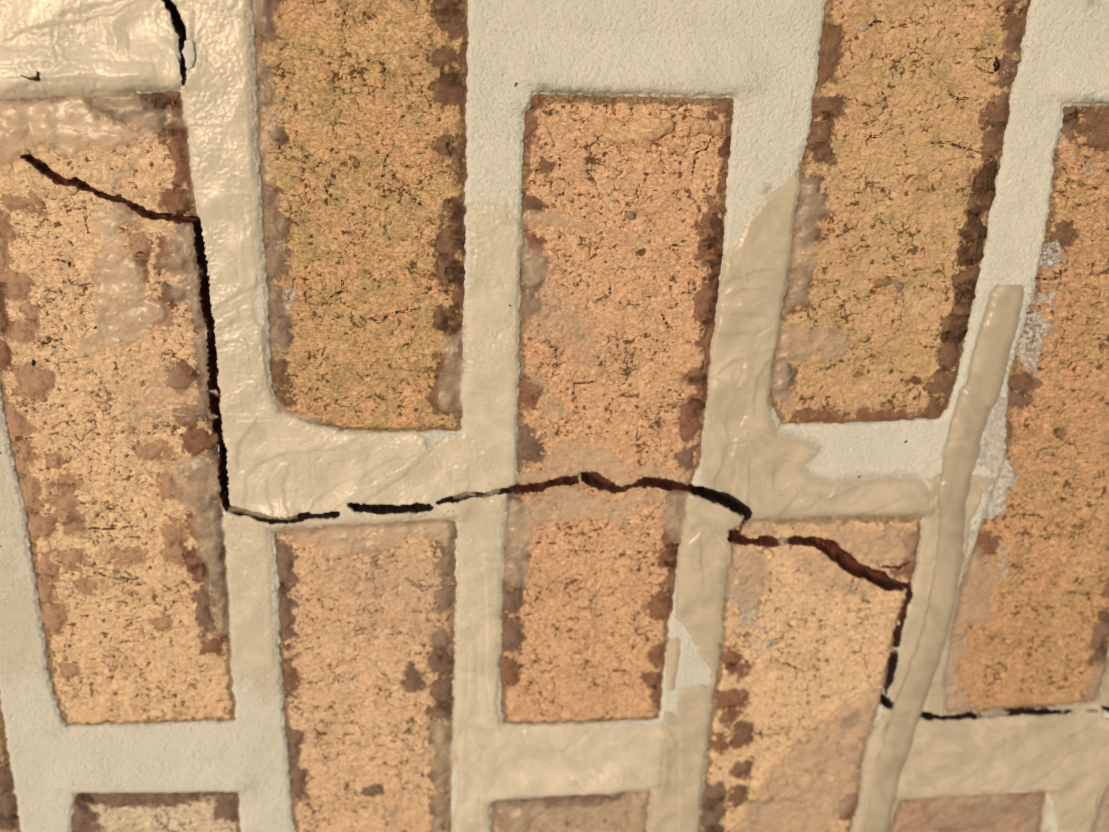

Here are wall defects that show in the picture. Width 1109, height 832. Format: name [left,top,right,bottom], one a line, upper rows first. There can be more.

crack [863,15,927,43]
crack [162,0,187,86]
crack [367,59,395,77]
crack [947,90,976,106]
crack [863,91,896,138]
crack [691,136,713,175]
crack [931,141,981,154]
crack [1035,270,1063,280]
crack [21,153,913,709]
crack [1011,513,1061,540]
crack [920,705,1109,721]